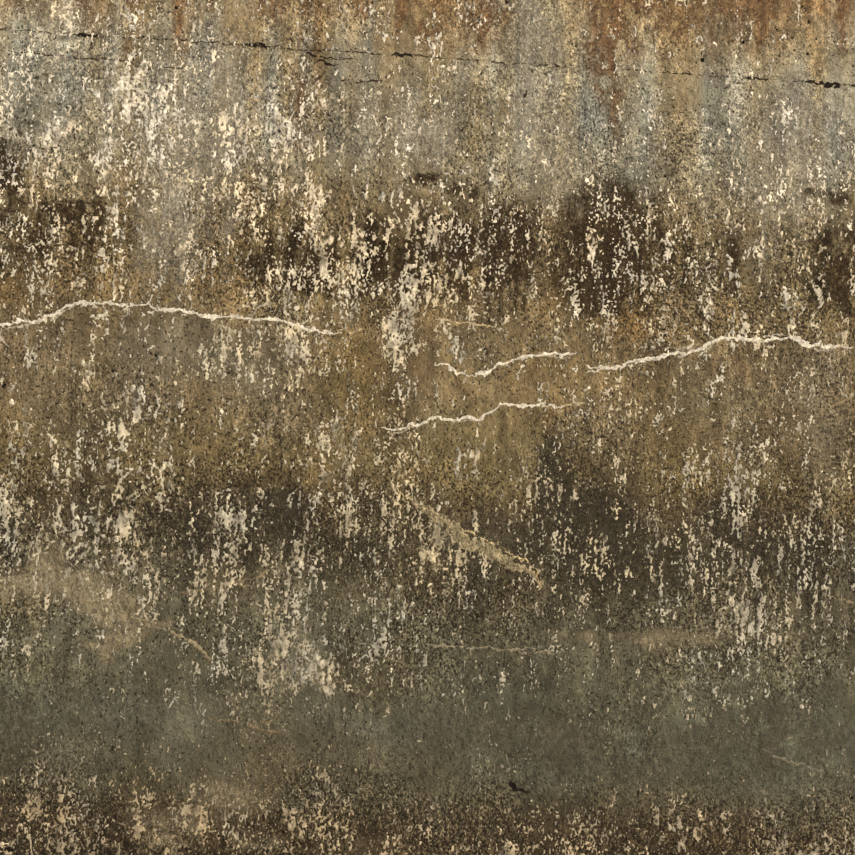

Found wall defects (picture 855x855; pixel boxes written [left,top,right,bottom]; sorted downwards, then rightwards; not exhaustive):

crack [0,27,772,84]
corrosion [585,0,660,122]
corrosion [655,0,778,50]
corrosion [820,0,848,51]
water stain [0,138,23,229]
water stain [20,191,106,259]
water stain [283,202,540,309]
water stain [564,180,694,316]
crack [0,300,363,347]
crack [434,333,853,385]
crack [382,402,586,434]
water stain [526,437,712,597]